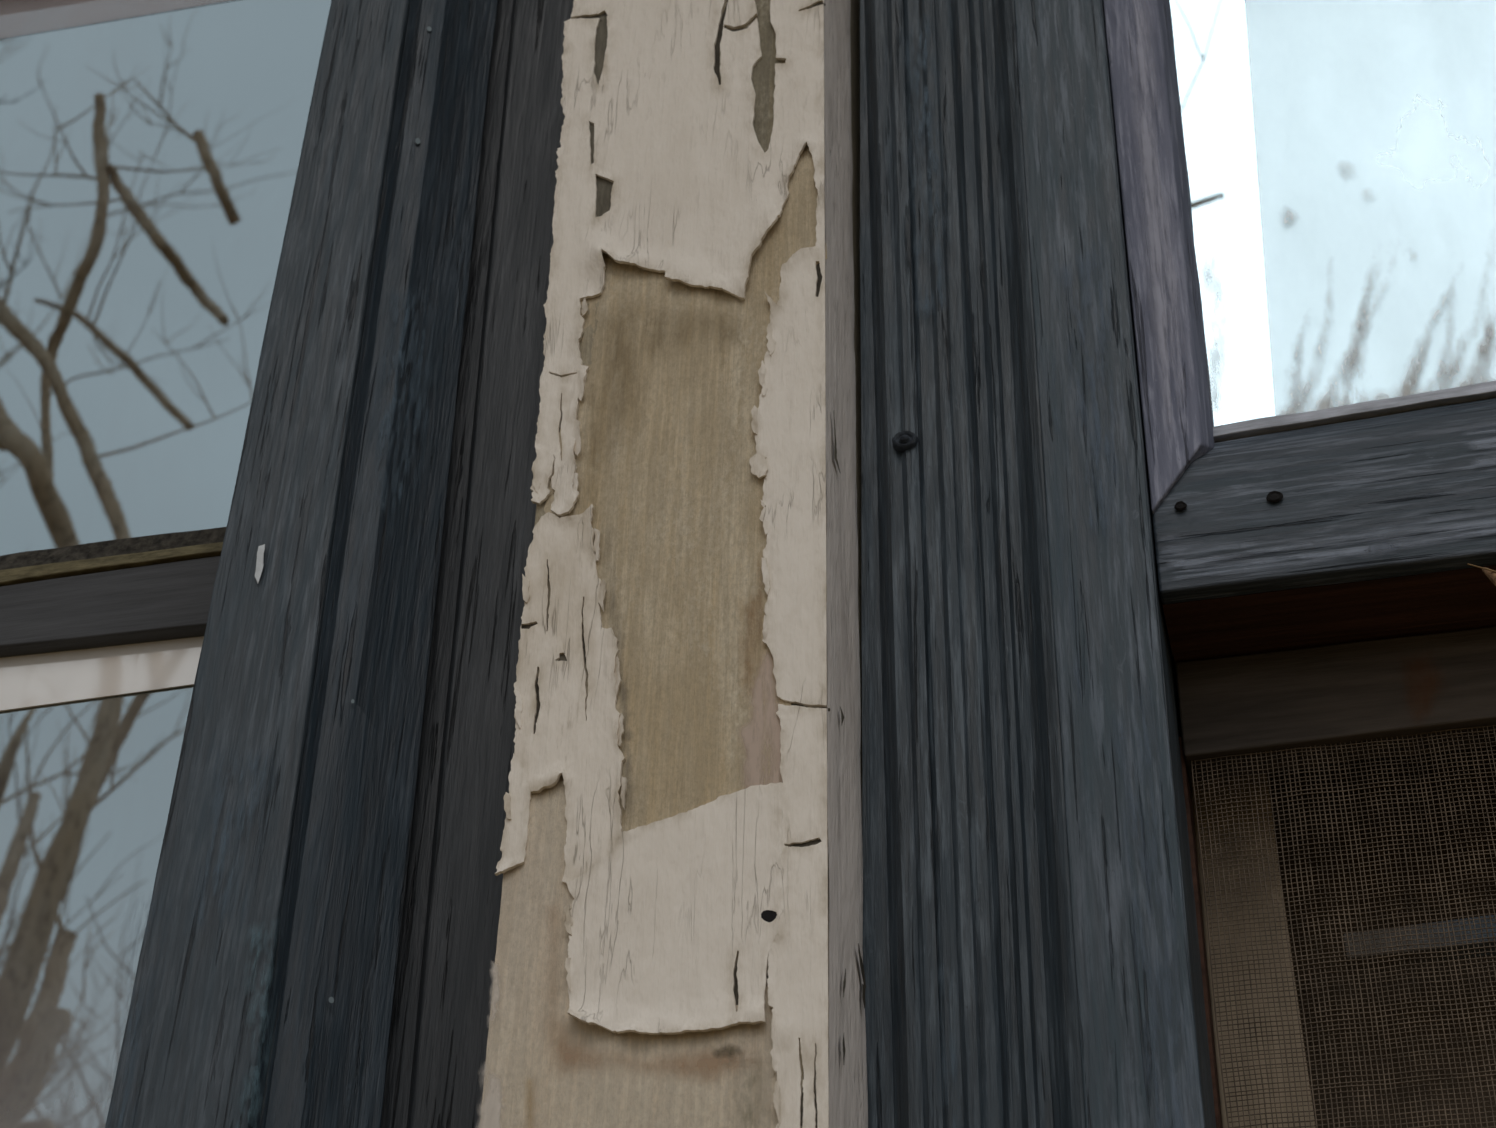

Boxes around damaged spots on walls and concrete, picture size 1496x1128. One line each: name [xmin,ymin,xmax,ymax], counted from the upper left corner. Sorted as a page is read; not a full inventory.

peeling [594,16,608,85]
peeling [752,0,781,153]
peeling [589,122,613,217]
peeling [479,145,827,1128]
peeling [843,943,866,1008]